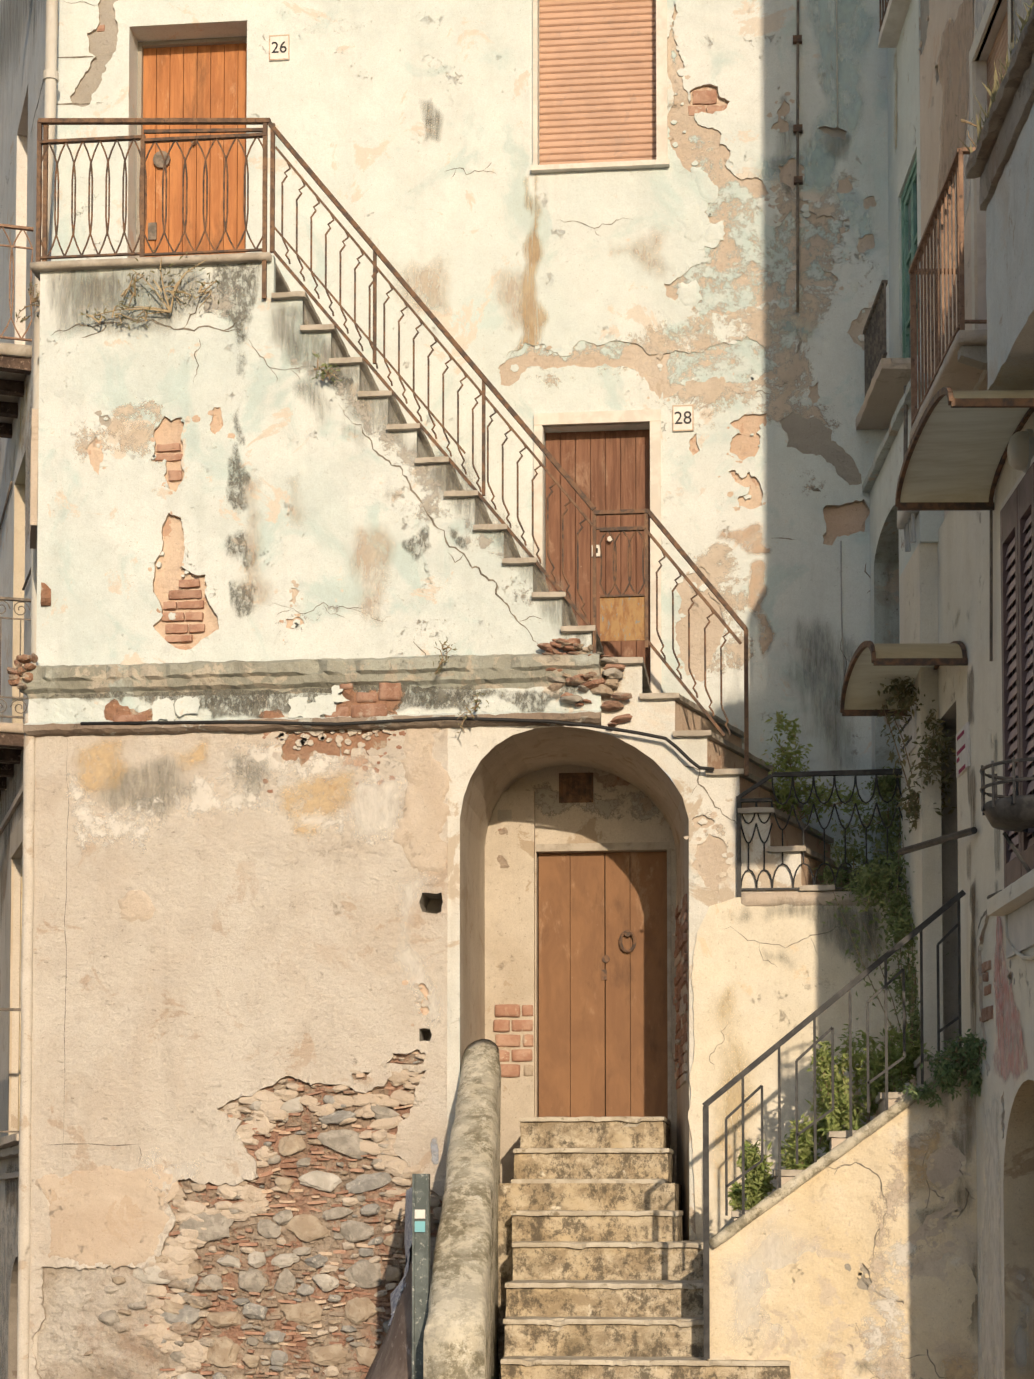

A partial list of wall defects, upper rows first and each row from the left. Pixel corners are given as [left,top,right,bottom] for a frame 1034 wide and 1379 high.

spalling [71,0,118,107]
water stain [62,268,196,325]
water stain [214,263,256,341]
peeling [496,4,877,511]
flaking render [73,401,235,650]
water stain [228,417,250,508]
water stain [227,534,256,615]
crack [338,403,541,644]
spalling [823,501,870,545]
spalling [68,685,406,850]
peeling [825,1120,965,1379]
crack [829,1129,974,1304]